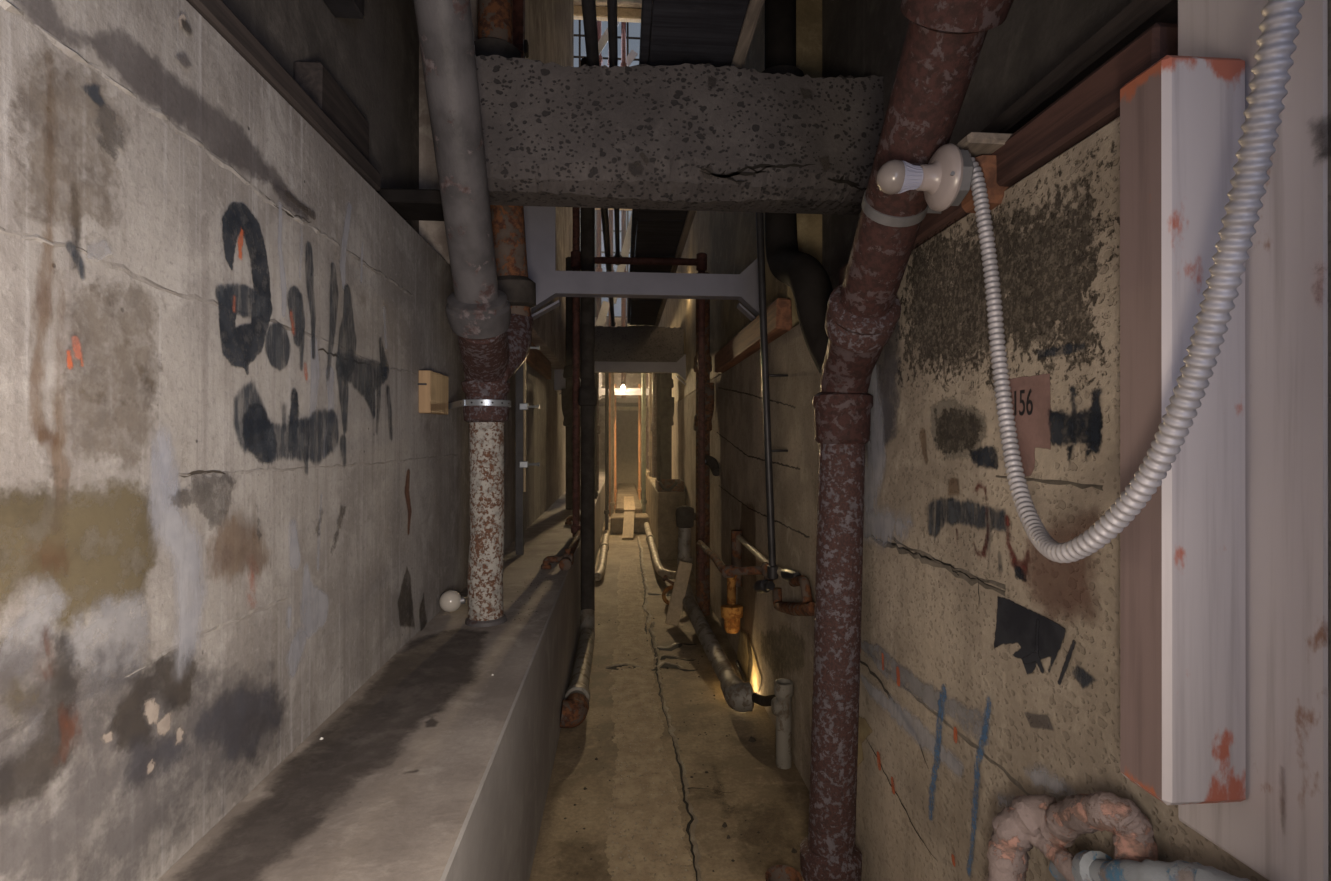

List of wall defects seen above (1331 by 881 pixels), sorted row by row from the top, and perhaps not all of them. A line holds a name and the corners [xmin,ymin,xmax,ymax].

water stain [20,0,77,43]
water stain [94,34,362,473]
crack [698,163,867,191]
water stain [0,438,282,881]
water stain [190,570,486,881]
crack [606,536,735,881]